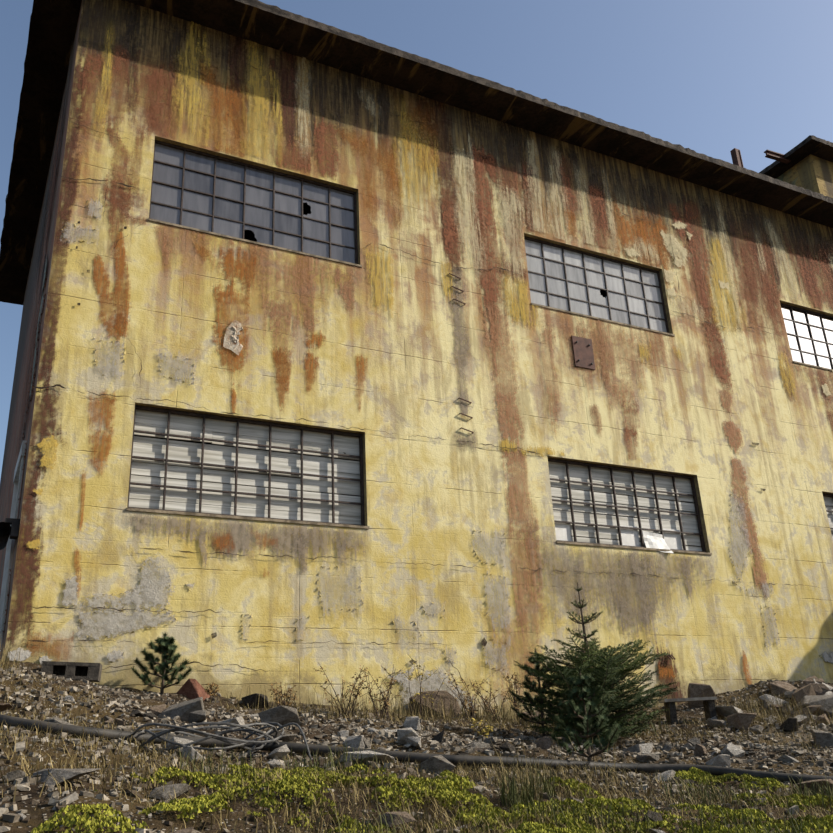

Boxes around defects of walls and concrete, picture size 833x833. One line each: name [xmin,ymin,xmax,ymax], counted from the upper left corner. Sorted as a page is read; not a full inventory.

peeling [15,259,49,518]
corrosion [80,47,181,343]
water stain [7,0,394,644]
spalling [223,320,243,355]
corrosion [187,231,357,406]
corrosion [468,146,545,630]
water stain [398,96,833,368]
corrosion [555,154,768,597]
crack [17,605,219,613]
peeling [62,556,177,640]
crack [248,640,474,701]
water stain [539,539,707,644]